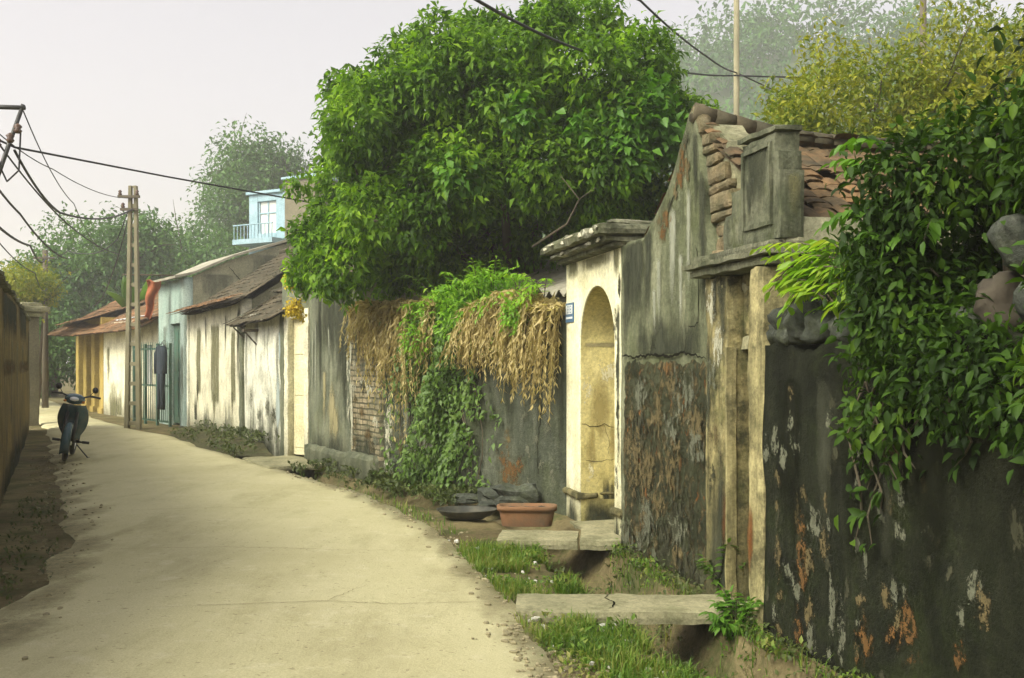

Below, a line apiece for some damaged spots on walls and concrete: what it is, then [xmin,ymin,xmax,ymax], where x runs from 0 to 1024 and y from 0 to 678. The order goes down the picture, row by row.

leakage [569,134,710,459]
crack [622,249,706,359]
leakage [702,279,725,331]
leakage [194,309,281,456]
spalling [582,277,724,590]
spalling [762,386,800,487]
leakage [712,462,725,588]
spalling [765,444,920,666]
spalling [1009,504,1024,567]
spalling [953,570,991,671]